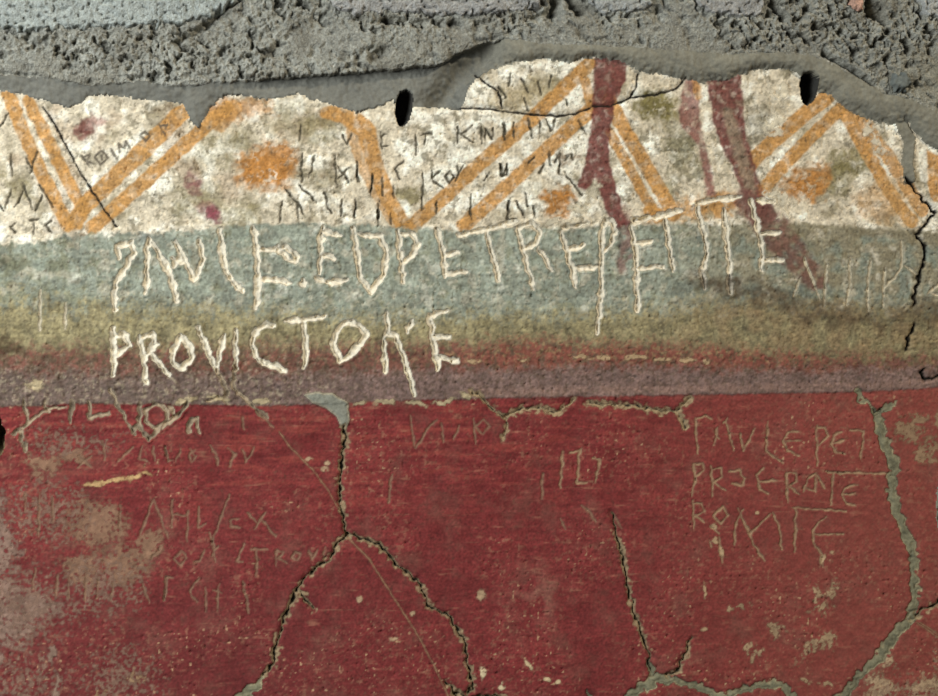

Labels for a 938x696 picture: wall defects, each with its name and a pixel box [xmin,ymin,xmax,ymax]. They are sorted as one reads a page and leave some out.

hole [395,90,414,127]
spalling [763,72,820,137]
peeling [863,120,887,154]
crack [905,177,937,351]
peeling [25,379,43,391]
peeling [175,395,230,405]
peeling [406,392,471,408]
crack [468,388,693,441]
peeling [0,426,163,696]
crack [234,423,507,696]
crack [833,388,938,696]
crack [611,512,797,696]